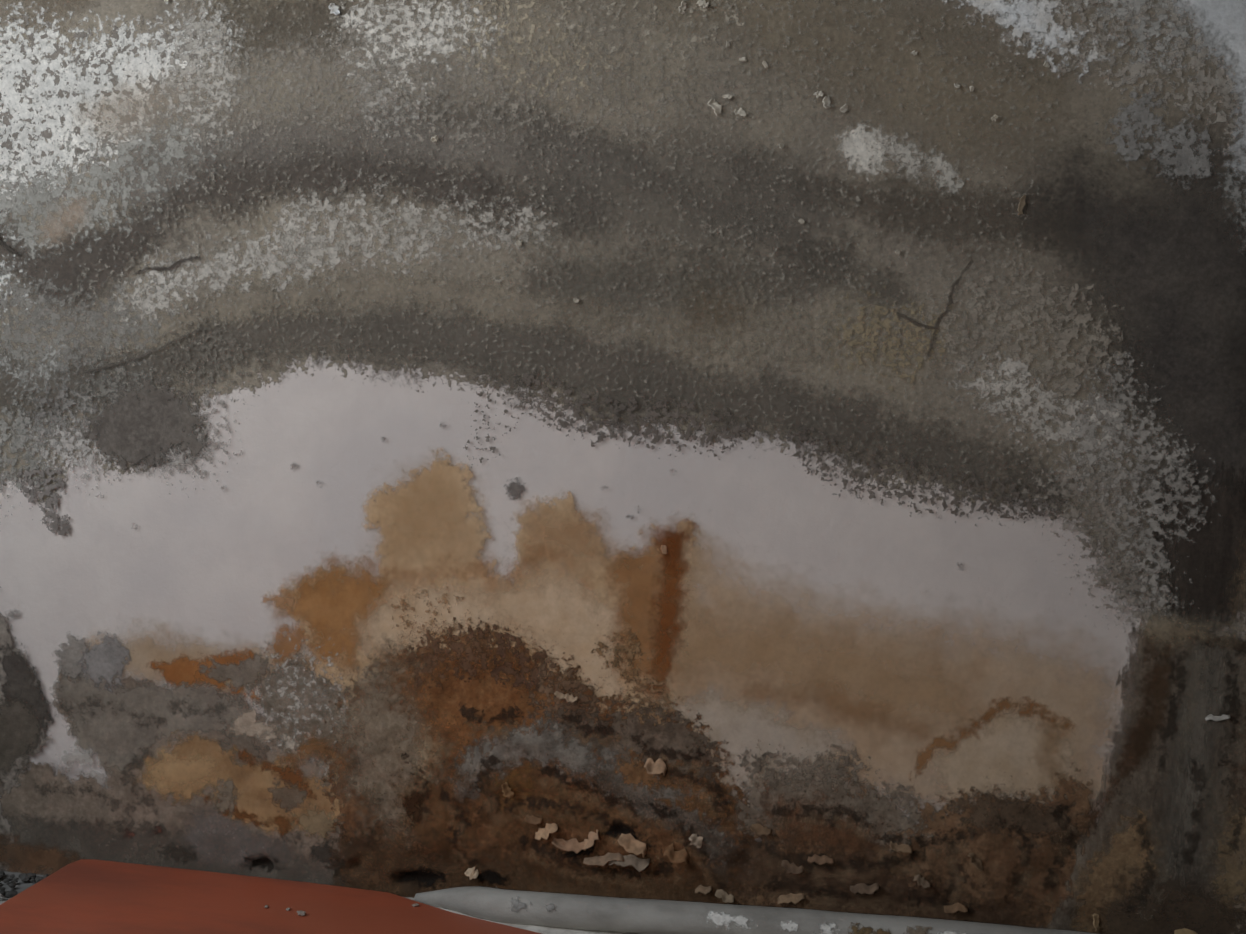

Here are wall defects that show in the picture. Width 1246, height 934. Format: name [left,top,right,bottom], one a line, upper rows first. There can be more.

crack [0,239,20,256]
crack [135,256,201,274]
crack [897,260,973,357]
water stain [463,402,500,455]
water stain [510,396,555,426]
water stain [505,478,524,500]
corrosion [122,449,1111,804]
spalling [0,586,1100,929]